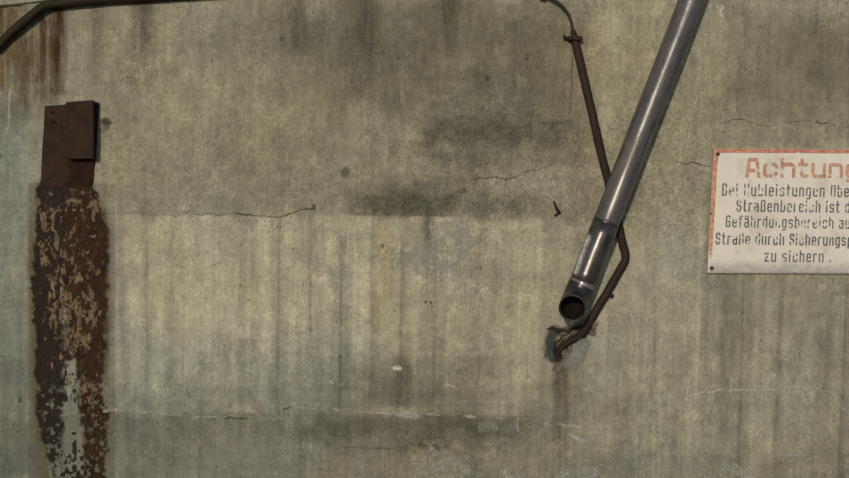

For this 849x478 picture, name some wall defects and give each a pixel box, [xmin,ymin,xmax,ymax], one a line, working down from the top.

corrosion [0,0,64,97]
corrosion [28,160,110,478]